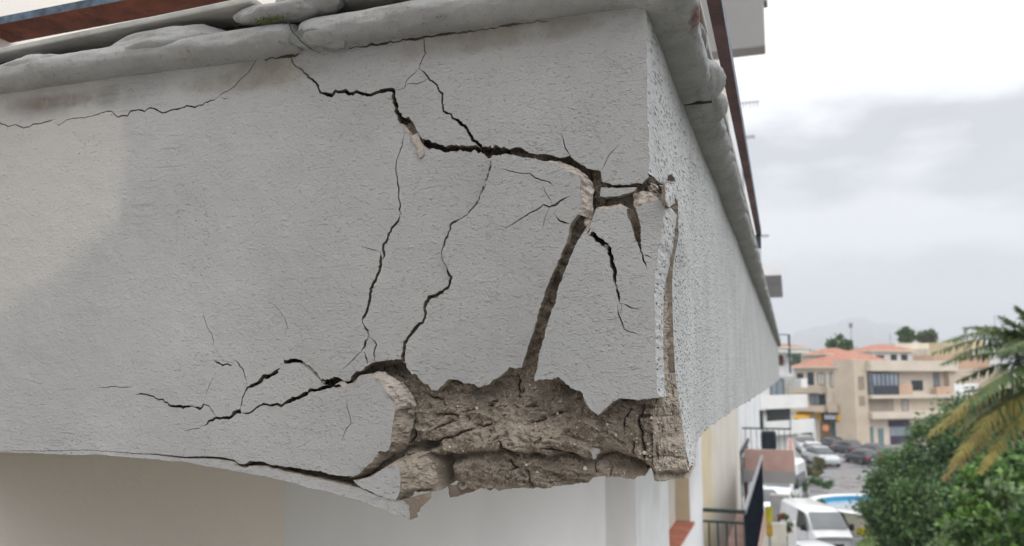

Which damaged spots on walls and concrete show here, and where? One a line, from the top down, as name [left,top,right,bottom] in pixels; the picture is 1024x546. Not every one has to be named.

crack [264,20,670,390]
crack [99,329,377,430]
crack [195,456,371,484]
spalling [0,353,695,520]